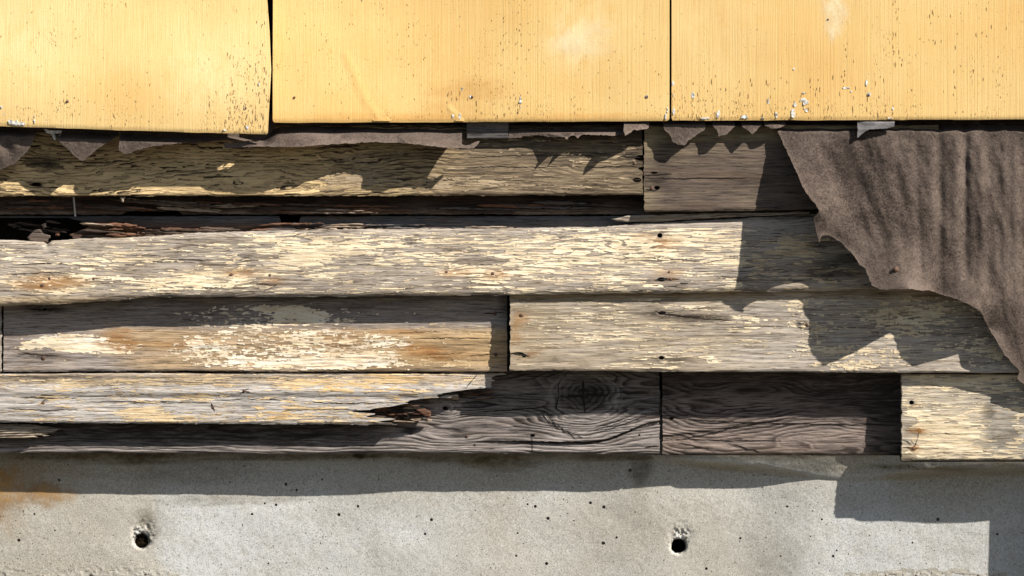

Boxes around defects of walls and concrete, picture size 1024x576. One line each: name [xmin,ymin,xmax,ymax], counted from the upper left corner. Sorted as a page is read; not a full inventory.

peeling [0,106,636,195]
peeling [0,227,1024,460]